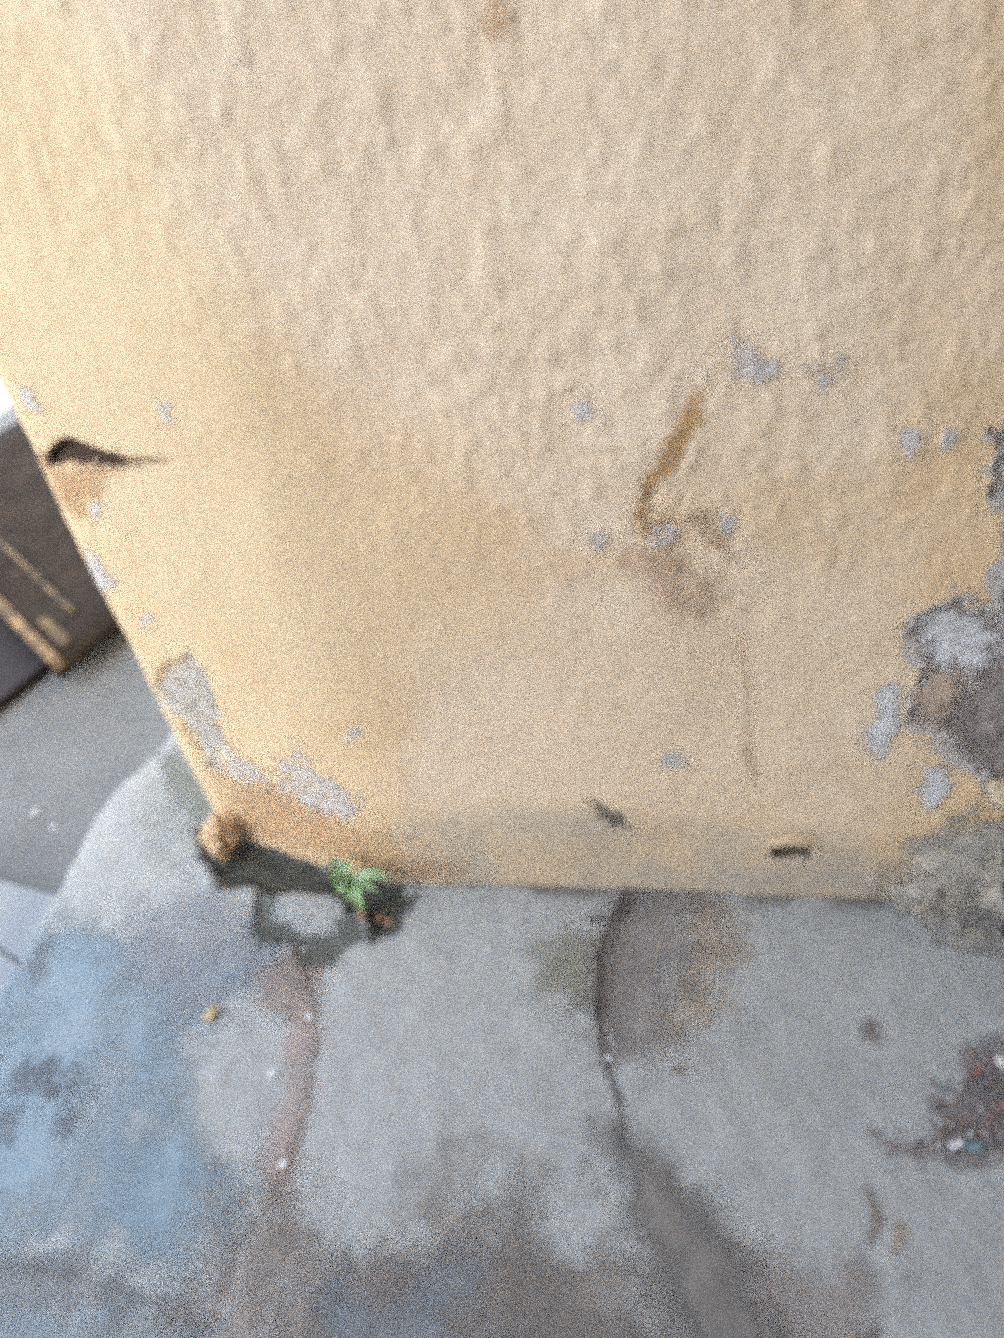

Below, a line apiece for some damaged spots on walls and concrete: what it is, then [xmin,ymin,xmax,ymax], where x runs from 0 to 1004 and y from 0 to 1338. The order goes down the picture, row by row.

corrosion [639,397,700,529]
peeling [155,653,364,824]
flaking render [855,421,1004,960]